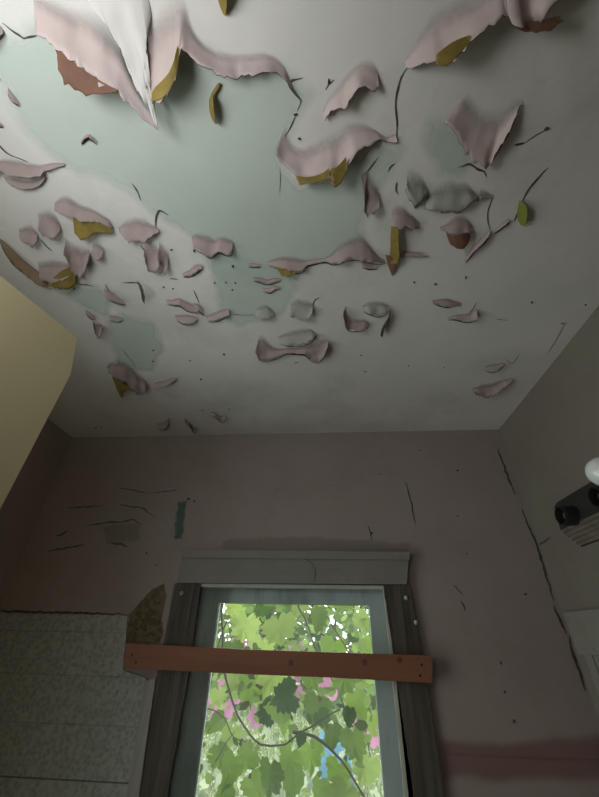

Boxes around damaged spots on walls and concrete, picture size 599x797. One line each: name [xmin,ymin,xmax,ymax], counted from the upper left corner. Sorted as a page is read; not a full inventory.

peeling [0,0,563,190]
peeling [362,159,379,218]
peeling [0,200,202,290]
peeling [192,236,234,268]
peeling [85,310,103,339]
peeling [104,285,125,305]
peeling [166,291,238,325]
peeling [343,304,391,337]
peeling [432,299,478,323]
peeling [255,330,328,363]
peeling [107,348,148,398]
crack [498,449,586,691]